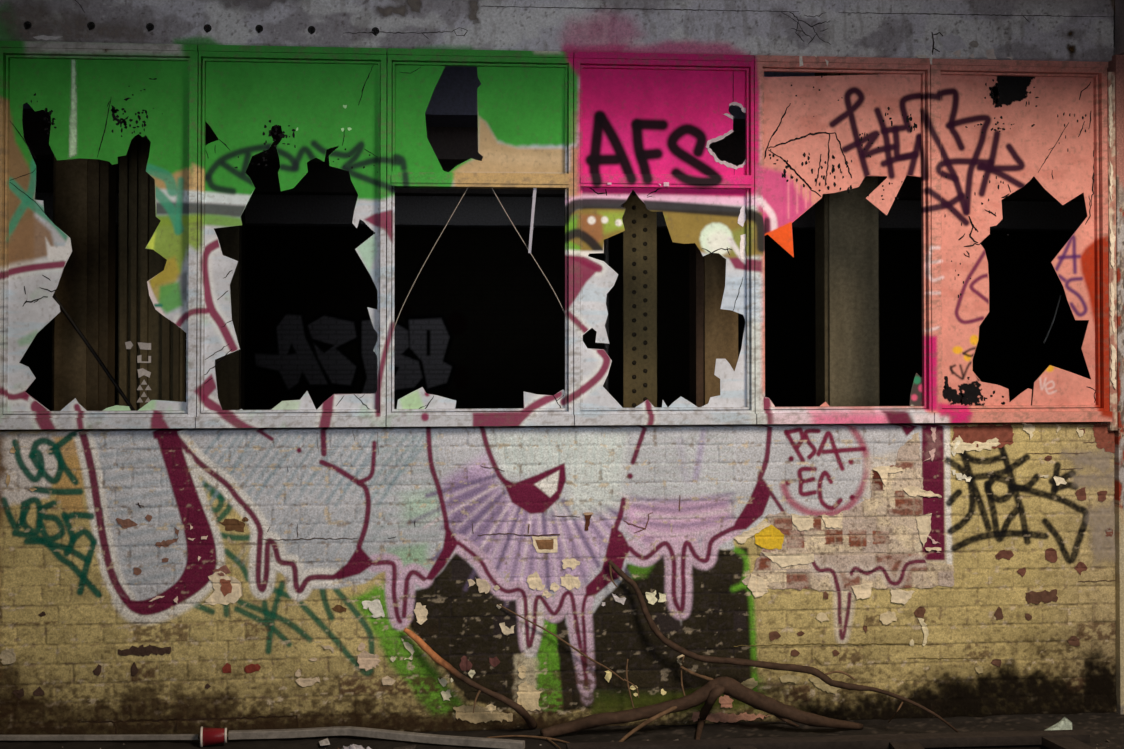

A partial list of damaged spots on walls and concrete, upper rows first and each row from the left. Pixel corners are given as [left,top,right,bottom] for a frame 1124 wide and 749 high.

crack [346,27,468,39]
crack [486,0,1115,55]
spalling [950,423,1035,456]
spalling [1076,423,1115,453]
spalling [734,427,954,646]
spalling [1025,589,1058,621]
leakage [0,667,568,735]
leakage [799,653,1117,720]